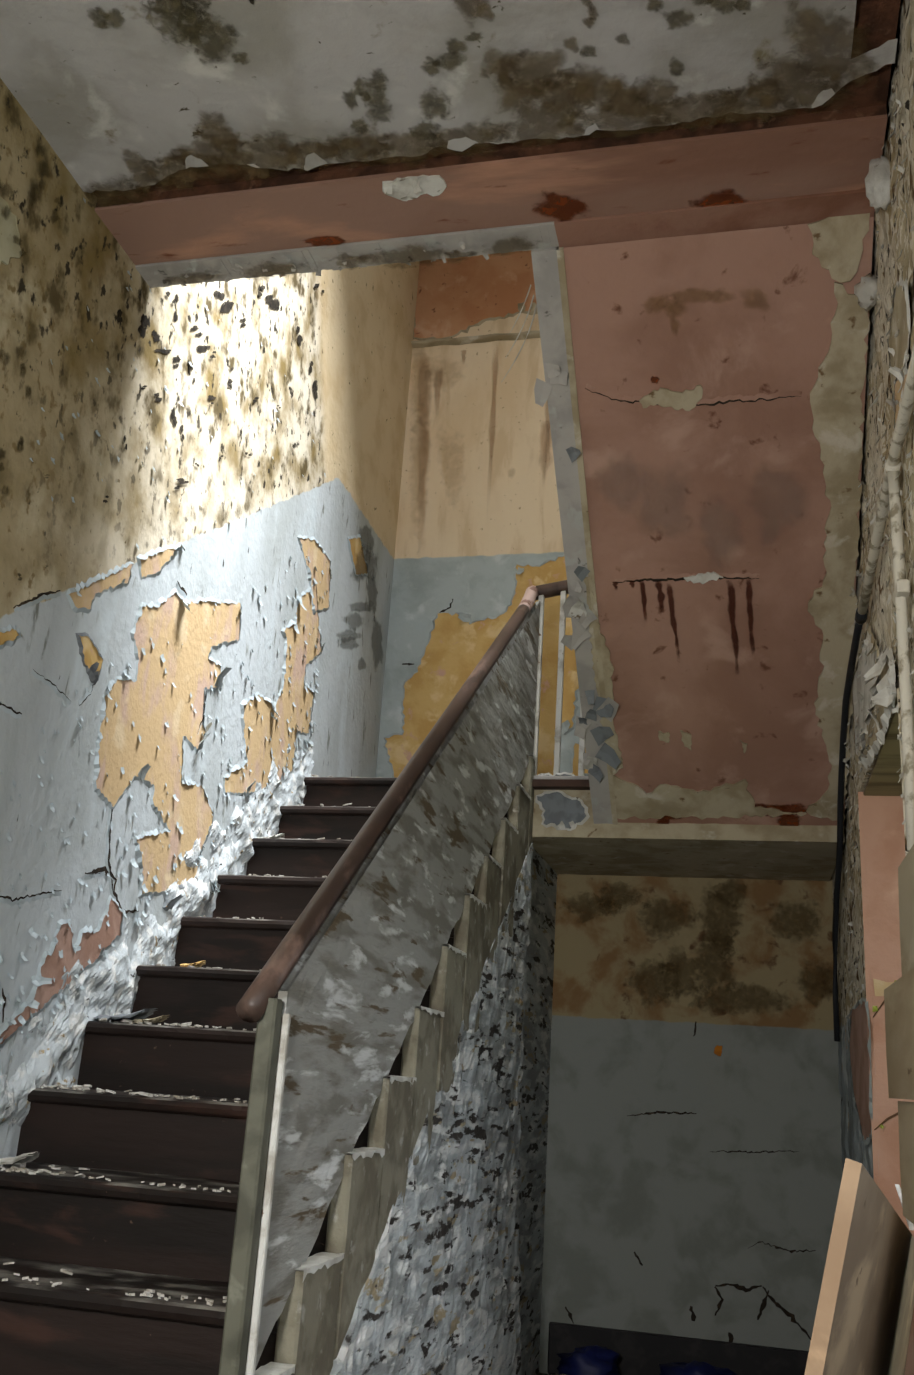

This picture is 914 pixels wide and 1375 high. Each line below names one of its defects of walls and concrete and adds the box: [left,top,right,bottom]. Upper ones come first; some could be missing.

water stain [84,0,870,207]
water stain [29,146,59,222]
peeling [0,196,21,265]
water stain [138,274,247,383]
water stain [141,385,184,440]
peeling [347,534,368,577]
rust [613,581,679,654]
rust [728,581,755,668]
crack [0,703,22,719]
crack [0,805,139,919]
crack [749,1241,816,1253]
crack [689,1283,811,1342]